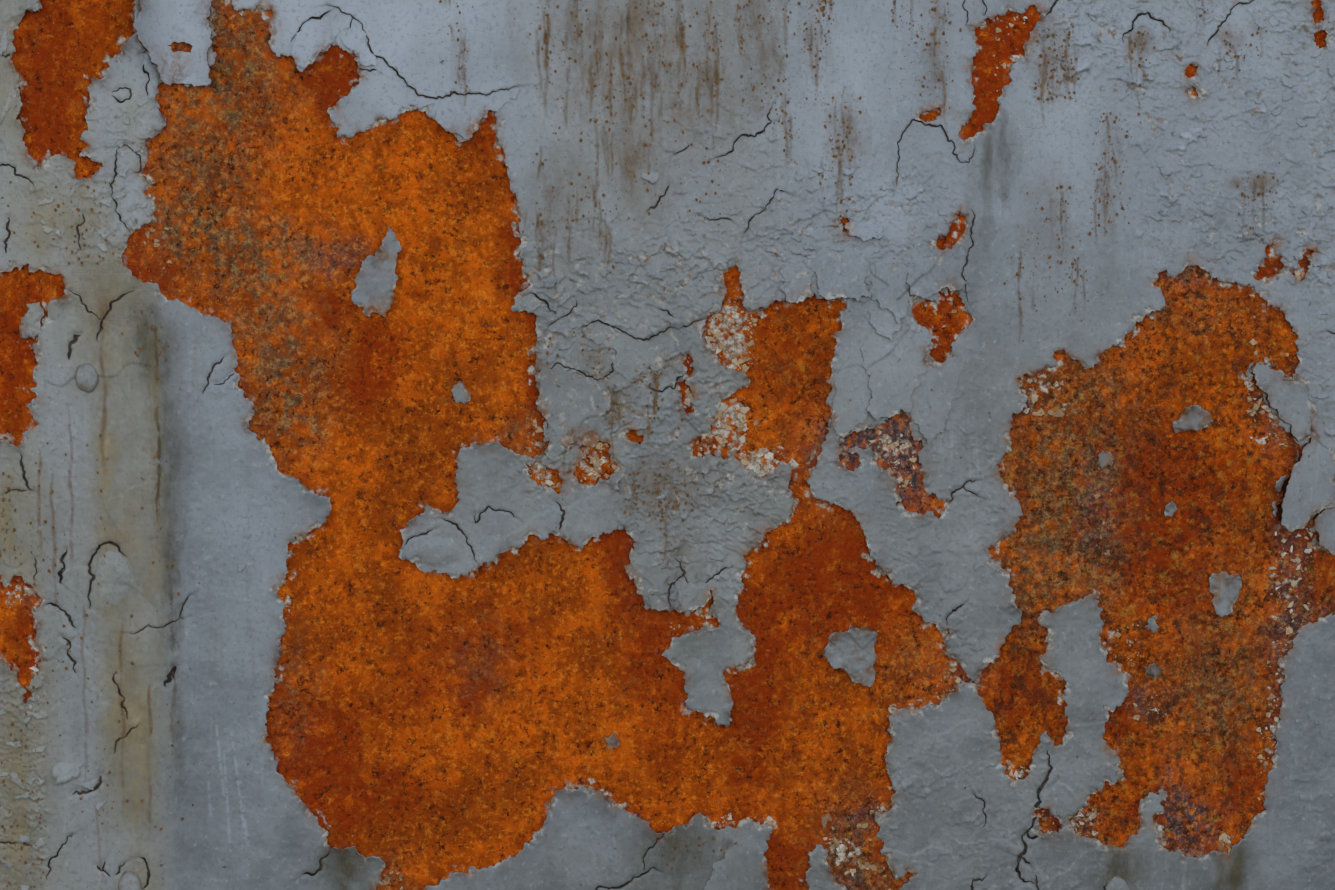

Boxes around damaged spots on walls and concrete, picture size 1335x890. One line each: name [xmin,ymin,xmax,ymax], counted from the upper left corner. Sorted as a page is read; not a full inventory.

rust [891,0,962,109]
peeling [959,5,1041,140]
rust [522,0,862,273]
peeling [1253,243,1284,282]
peeling [121,0,973,890]
rust [633,331,683,439]
crack [33,541,125,673]
rust [623,461,711,581]
peeling [972,265,1335,858]
crack [72,670,140,795]
crack [164,666,177,687]
crack [97,857,150,889]